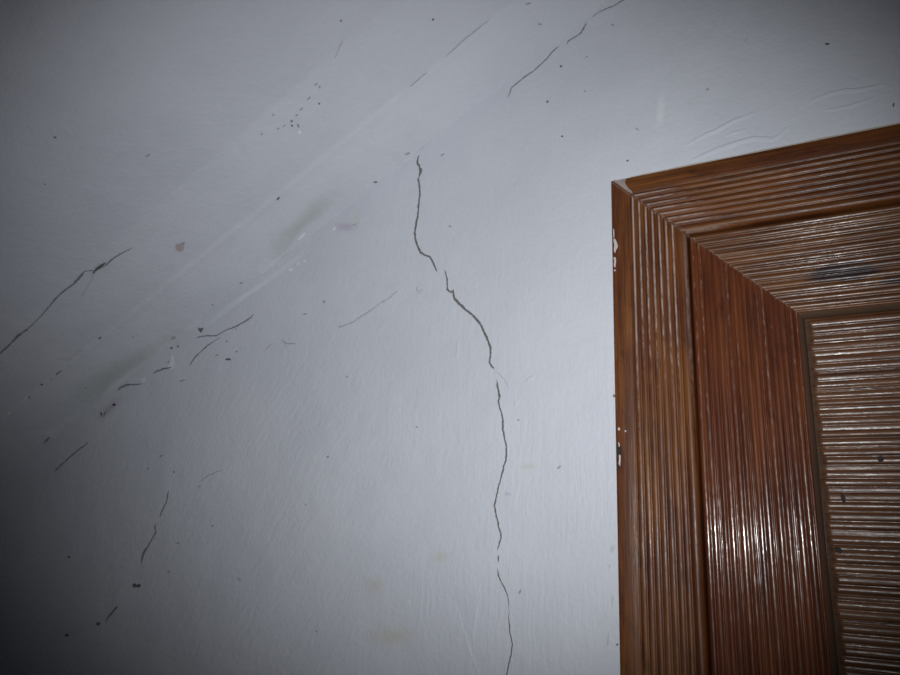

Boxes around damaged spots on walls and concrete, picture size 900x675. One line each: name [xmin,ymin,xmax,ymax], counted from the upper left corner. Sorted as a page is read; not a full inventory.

crack [507,0,624,98]
crack [0,247,134,354]
crack [117,314,254,391]
crack [338,154,513,675]
crack [131,489,170,588]